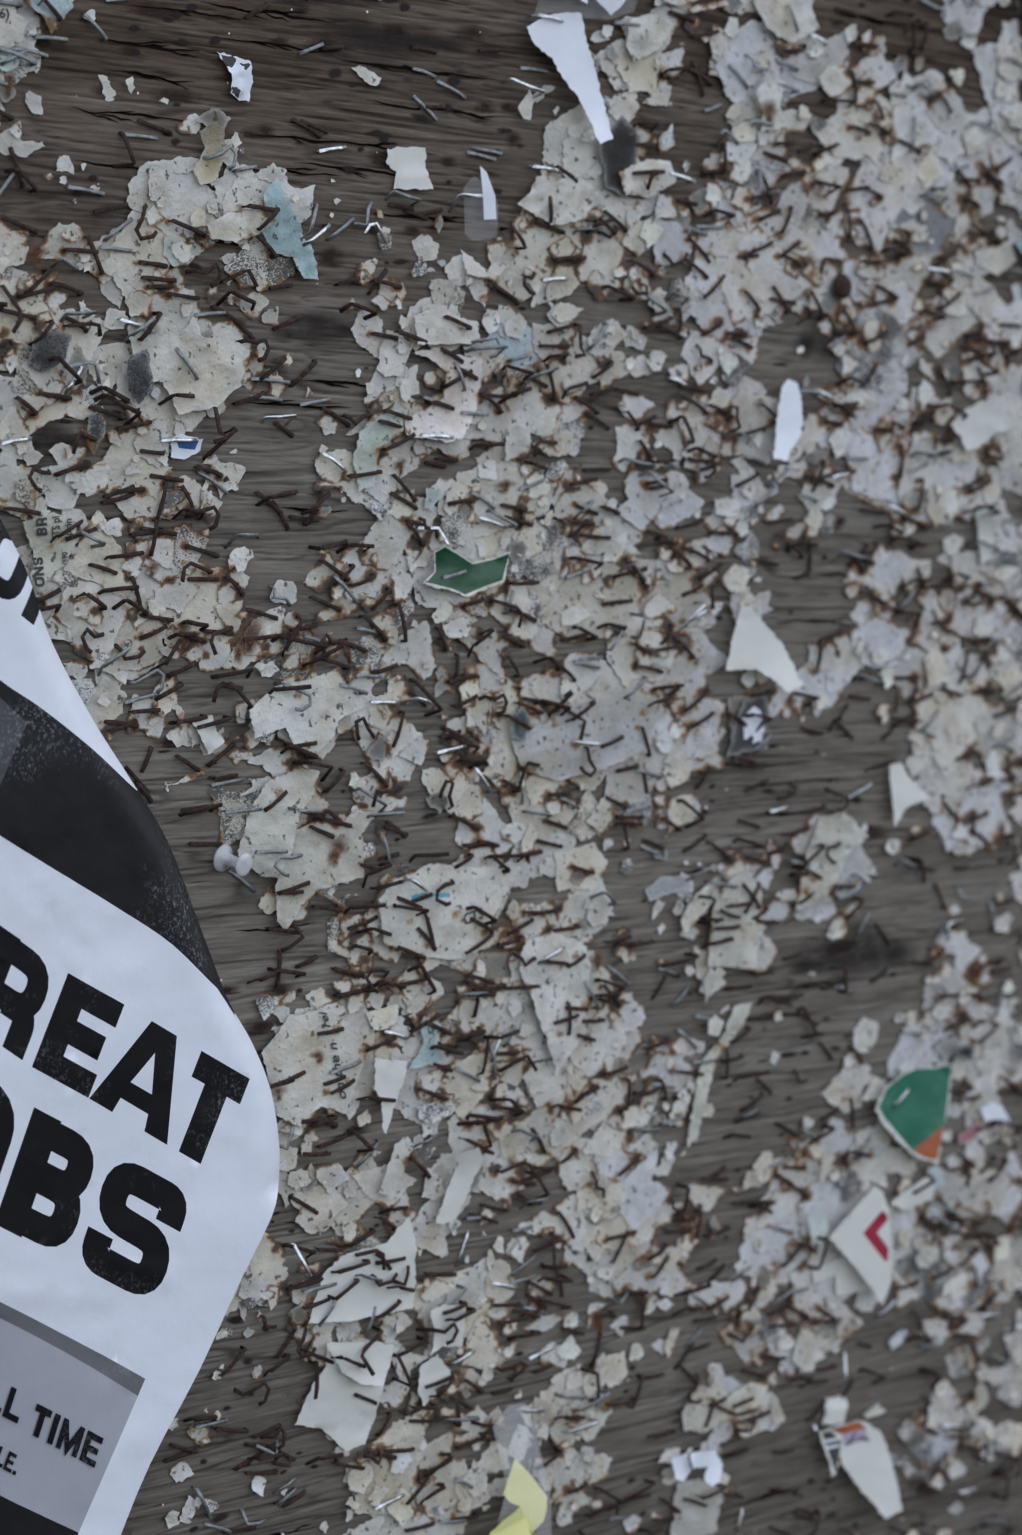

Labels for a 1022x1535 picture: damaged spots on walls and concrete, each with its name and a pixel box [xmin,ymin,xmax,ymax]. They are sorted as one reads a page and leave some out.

rust [6,74,14,96]
rust [763,103,775,123]
rust [235,620,260,661]
rust [329,840,344,866]